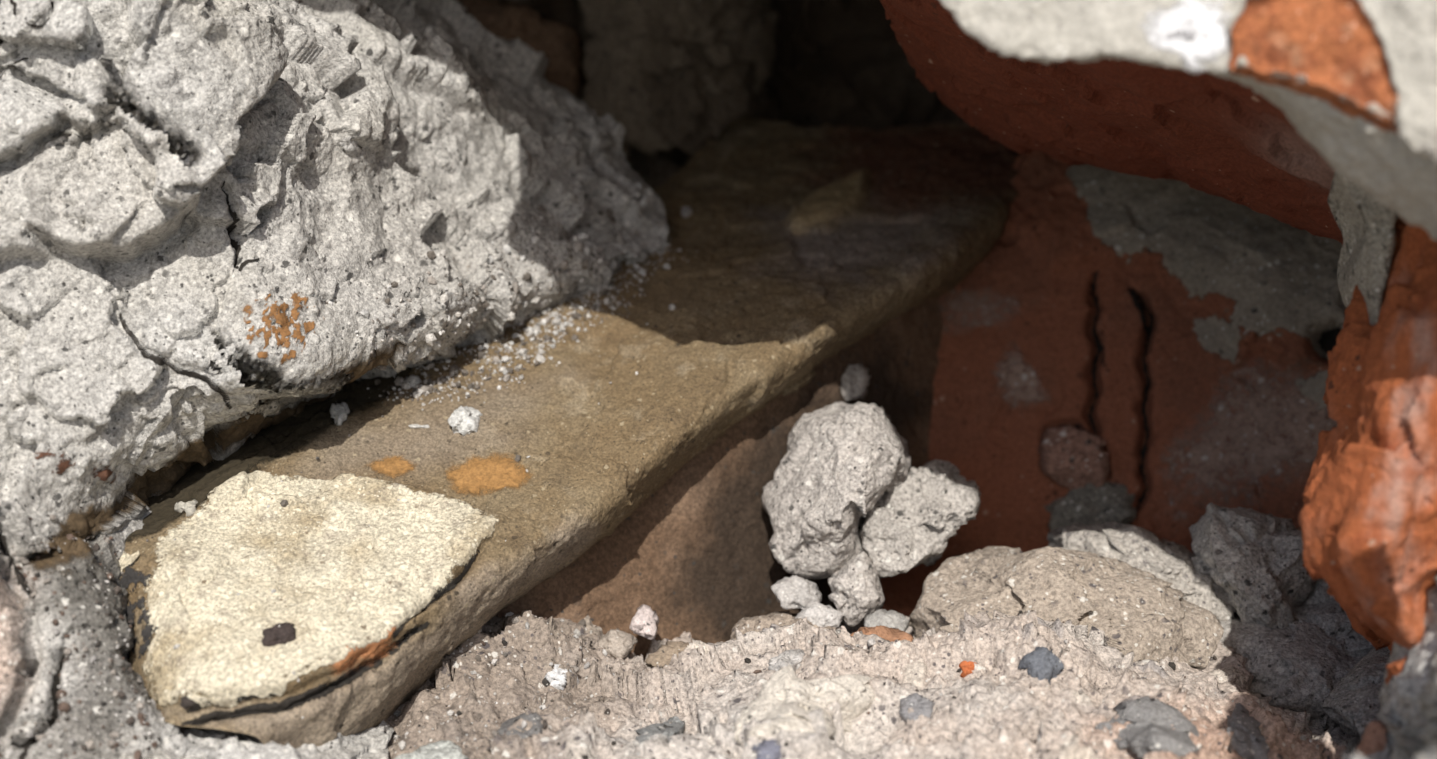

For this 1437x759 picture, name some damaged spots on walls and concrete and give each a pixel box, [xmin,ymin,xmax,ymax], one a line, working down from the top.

crack [0,0,54,78]
spalling [1229,0,1399,135]
crack [119,312,232,410]
rust [243,292,315,364]
crack [1042,271,1154,511]